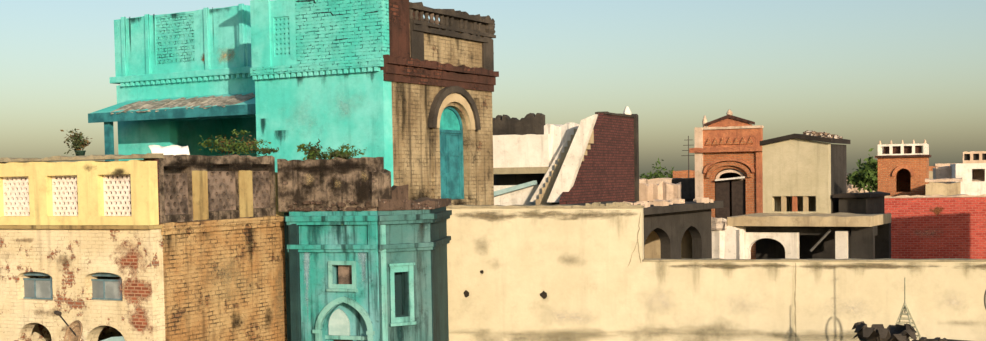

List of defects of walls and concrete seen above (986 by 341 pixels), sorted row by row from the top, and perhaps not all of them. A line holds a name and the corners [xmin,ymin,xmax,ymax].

crack [628,217,641,266]
flaking render [116,243,152,332]